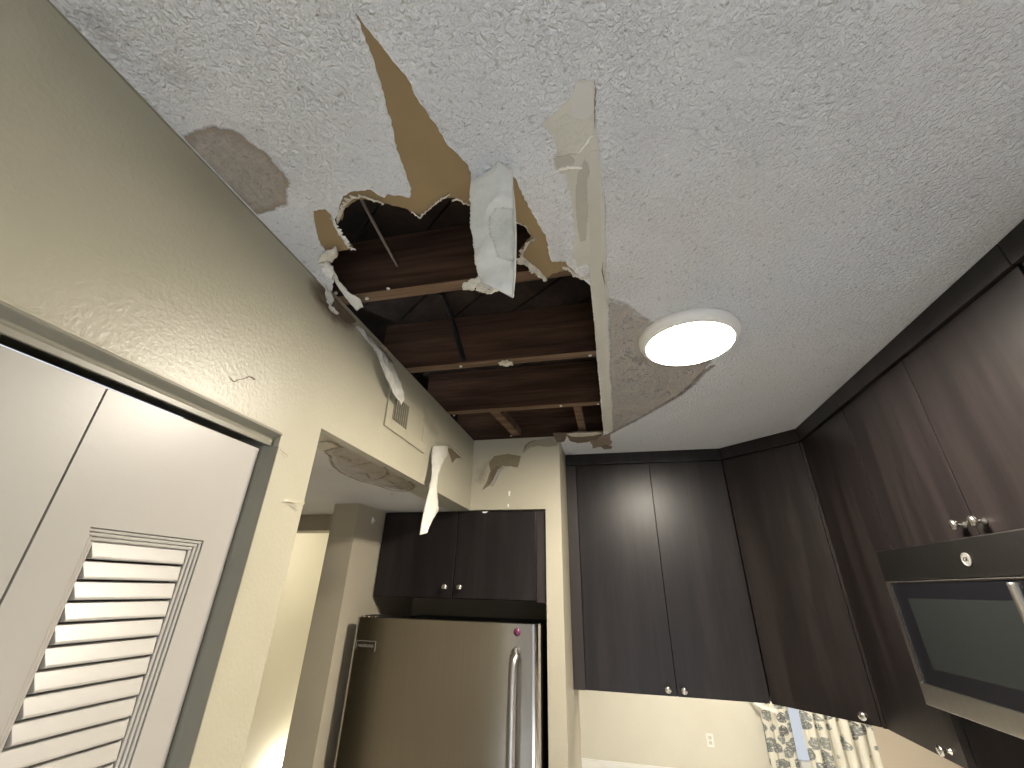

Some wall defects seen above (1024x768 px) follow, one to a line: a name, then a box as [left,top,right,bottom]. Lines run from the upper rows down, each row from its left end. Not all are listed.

leakage [185,127,289,214]
peeling [489,207,514,261]
peeling [542,79,613,432]
peeling [356,326,405,405]
peeling [482,438,558,490]